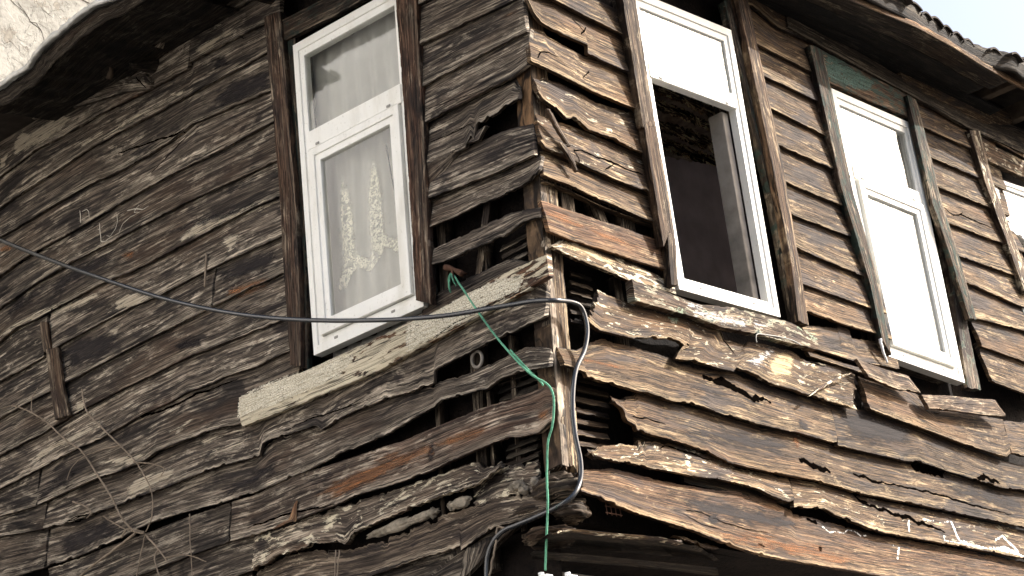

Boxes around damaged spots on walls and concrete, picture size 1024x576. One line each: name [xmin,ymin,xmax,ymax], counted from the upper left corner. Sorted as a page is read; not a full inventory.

crack [573,149,643,175]
crack [702,374,771,404]
crack [799,458,1012,533]